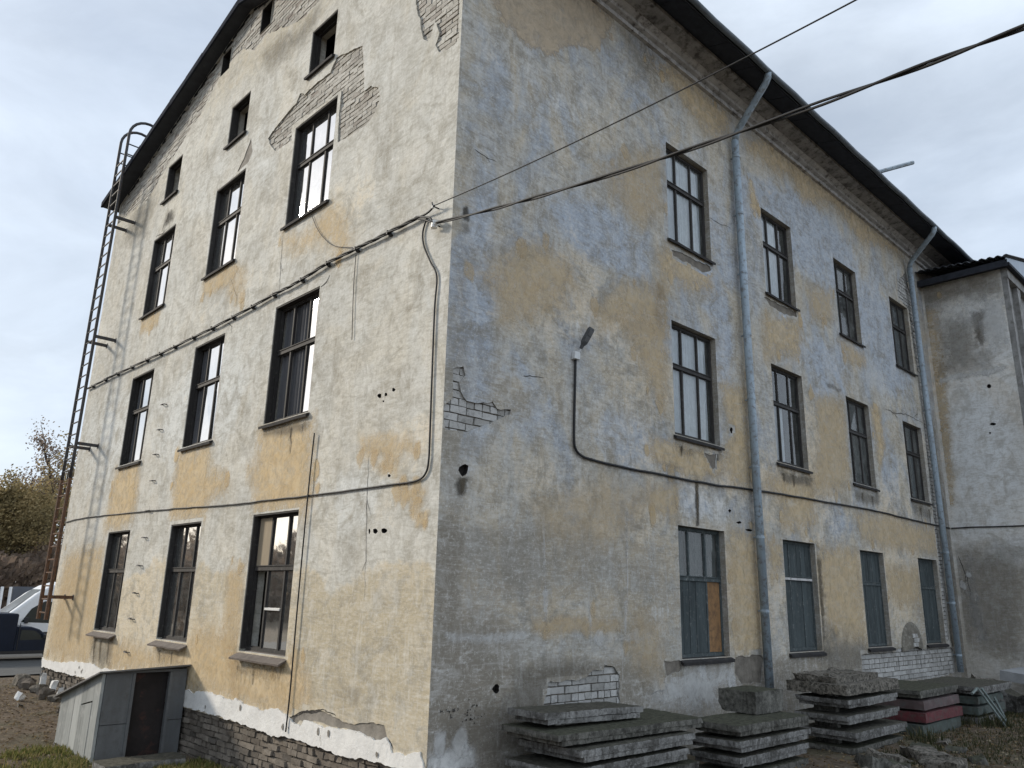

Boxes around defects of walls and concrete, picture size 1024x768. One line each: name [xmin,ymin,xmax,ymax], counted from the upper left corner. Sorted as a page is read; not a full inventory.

spalling [416,0,460,52]
spalling [268,46,380,151]
spalling [444,366,511,432]
spalling [861,273,955,680]
peeling [41,546,485,768]
spalling [544,665,620,705]